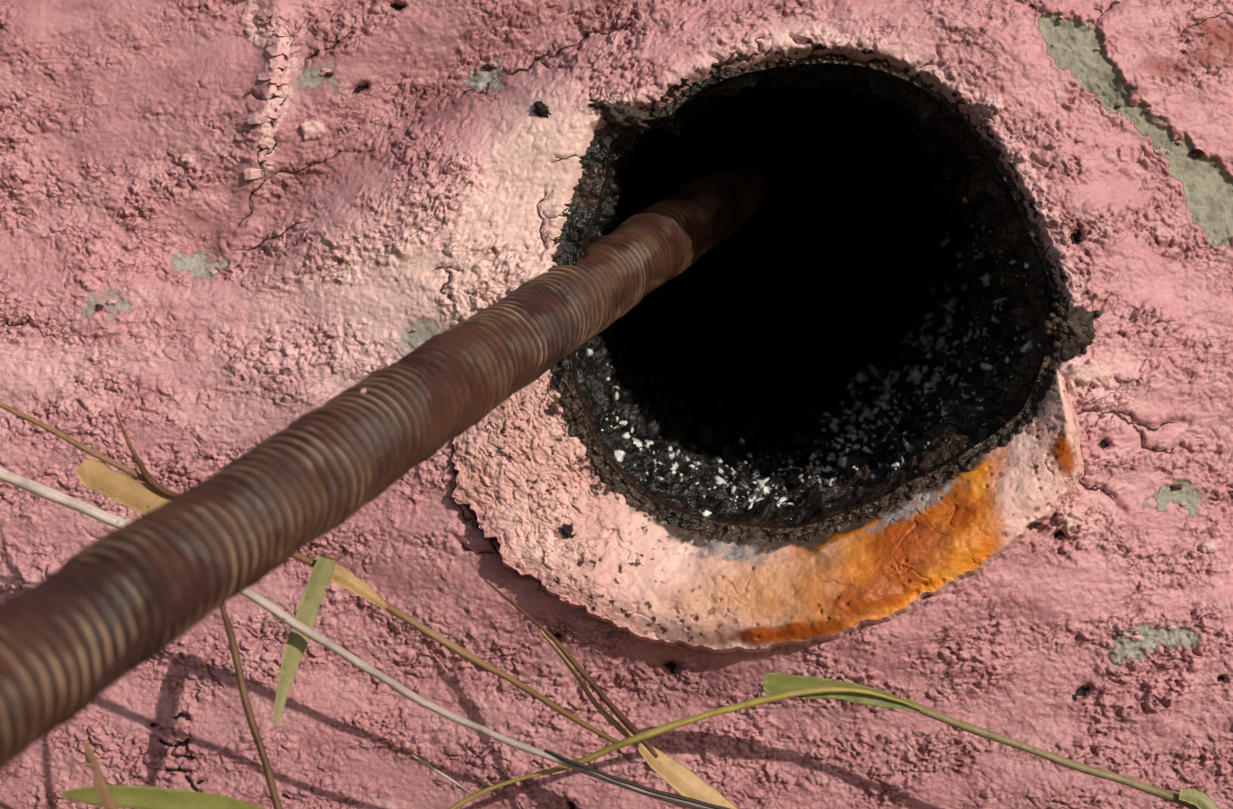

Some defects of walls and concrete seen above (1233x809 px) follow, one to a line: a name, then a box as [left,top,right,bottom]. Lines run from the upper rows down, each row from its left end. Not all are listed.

crack [227,27,362,250]
peeling [1038,13,1233,248]
corrosion [1053,434,1074,474]
crack [1077,409,1179,454]
crack [1078,480,1121,509]
peeling [1143,480,1202,518]
corrosion [727,459,1000,644]
peeling [1108,623,1199,668]